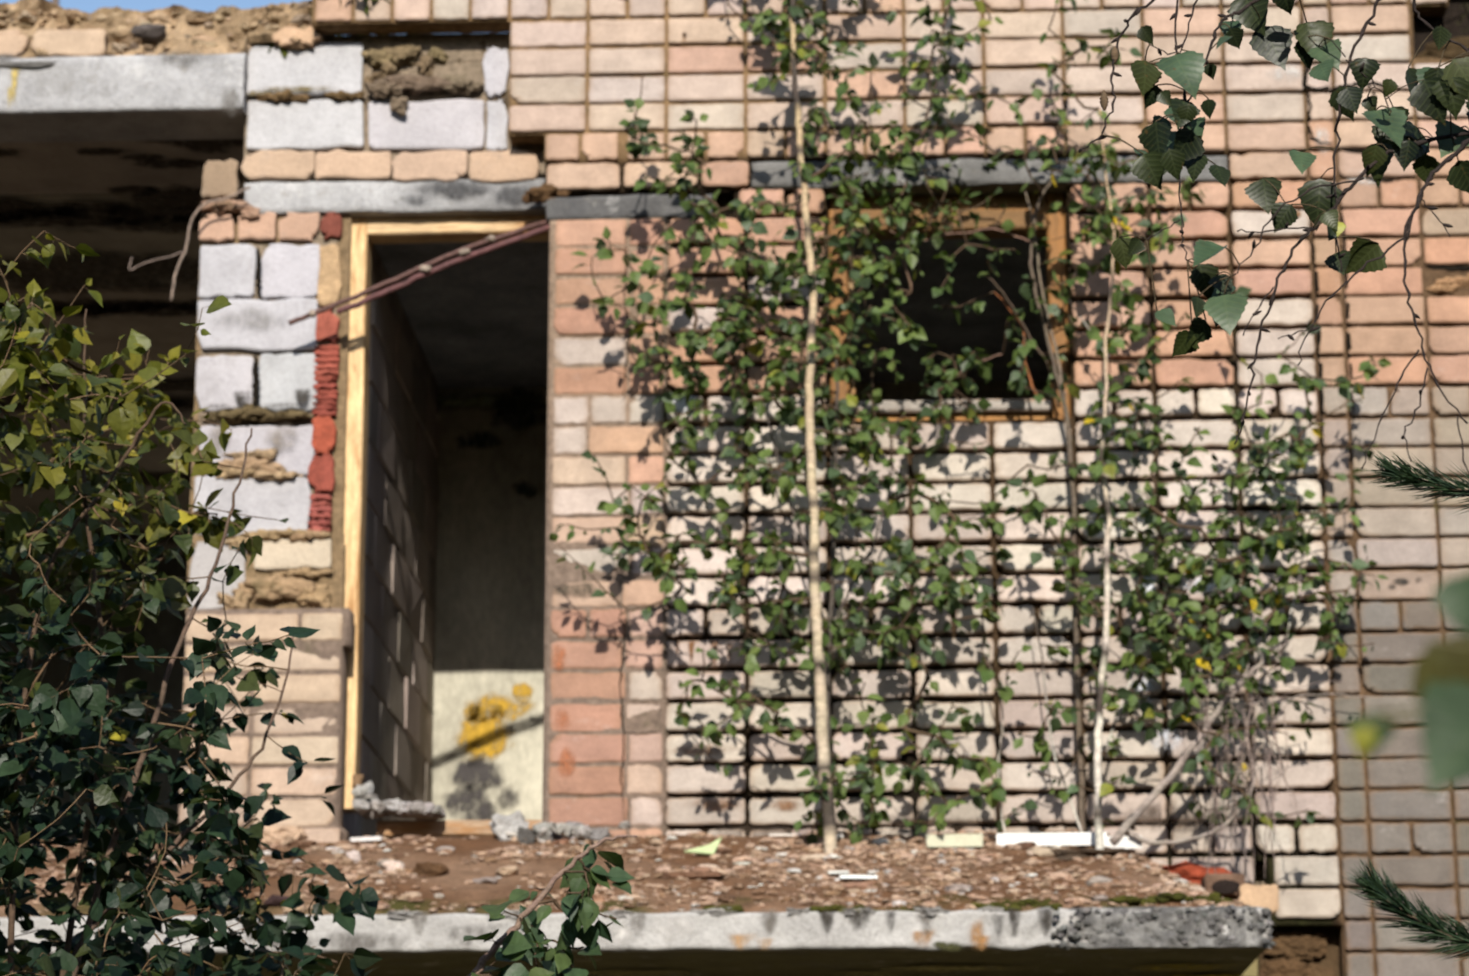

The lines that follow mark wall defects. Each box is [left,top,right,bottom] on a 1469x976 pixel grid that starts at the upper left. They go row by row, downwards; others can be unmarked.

spalling [1413,0,1469,60]
spalling [1050,904,1337,976]